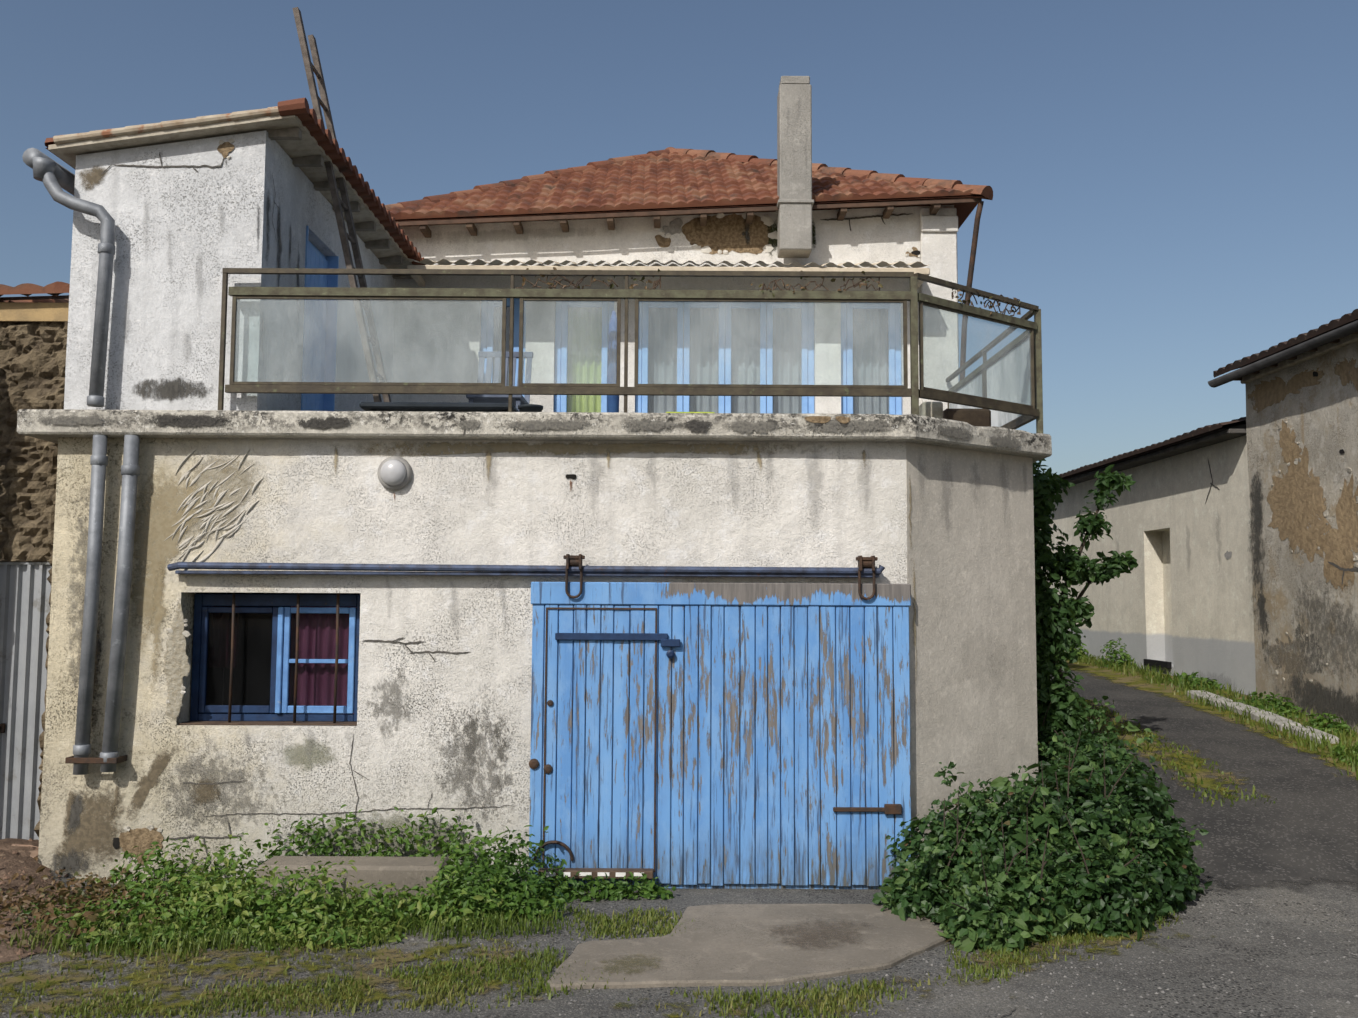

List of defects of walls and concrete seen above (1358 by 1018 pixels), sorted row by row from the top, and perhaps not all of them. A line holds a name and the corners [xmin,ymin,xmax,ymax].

crack [102,153,224,174]
spalling [655,212,777,255]
water stain [134,378,207,401]
spalling [1247,357,1358,591]
water stain [1249,471,1269,661]
crack [362,638,469,661]
water stain [1284,676,1358,726]
water stain [52,752,170,876]